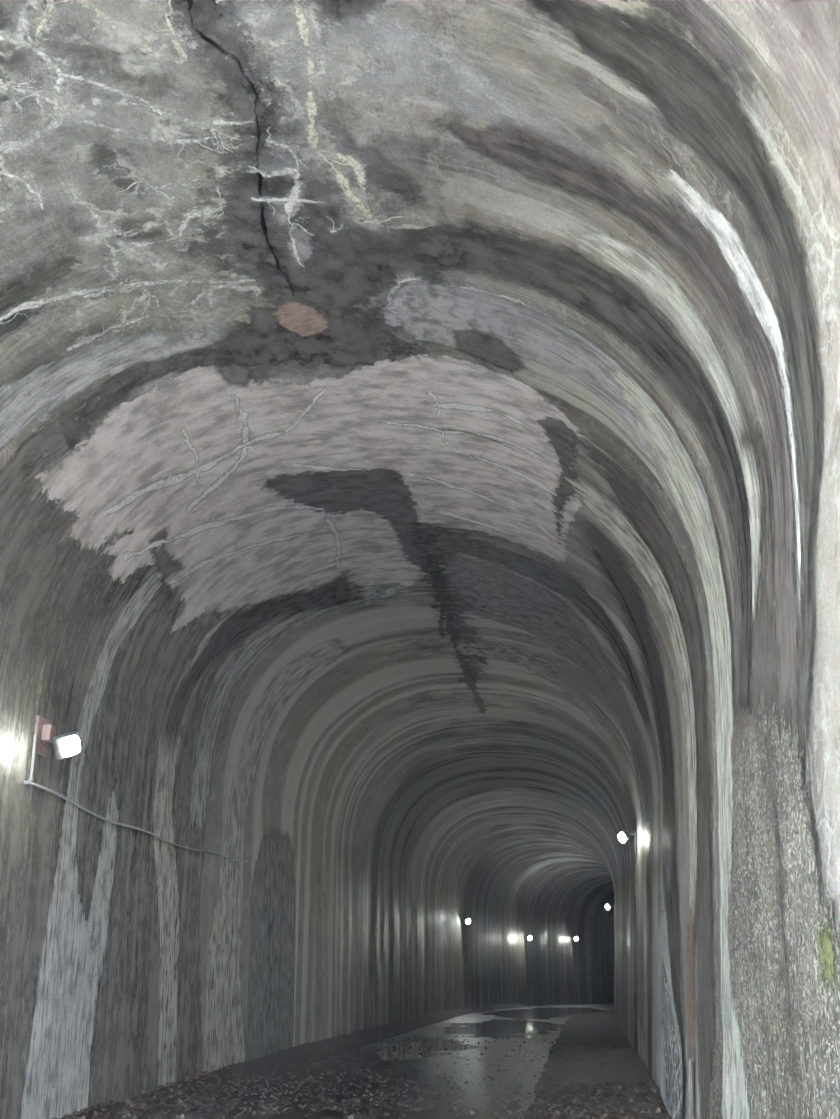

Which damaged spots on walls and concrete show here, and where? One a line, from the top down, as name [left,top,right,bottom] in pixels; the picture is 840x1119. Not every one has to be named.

leakage [0,0,69,70]
leakage [0,154,51,224]
leakage [39,131,192,247]
crack [0,0,430,351]
leakage [55,286,152,332]
leakage [99,240,204,308]
peeling [35,354,589,633]
spalling [706,693,840,1119]
peeling [656,912,683,1119]